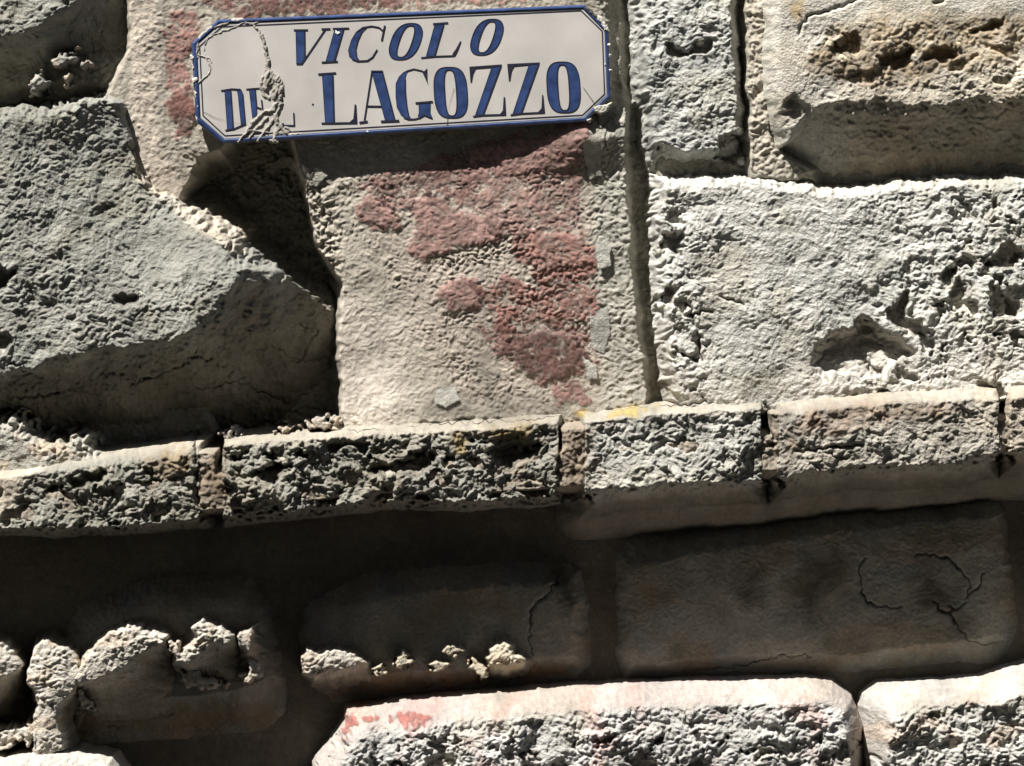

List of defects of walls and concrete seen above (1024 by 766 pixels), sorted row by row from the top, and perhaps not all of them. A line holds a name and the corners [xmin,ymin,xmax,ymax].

peeling [355,101,615,407]
crack [937,566,997,645]